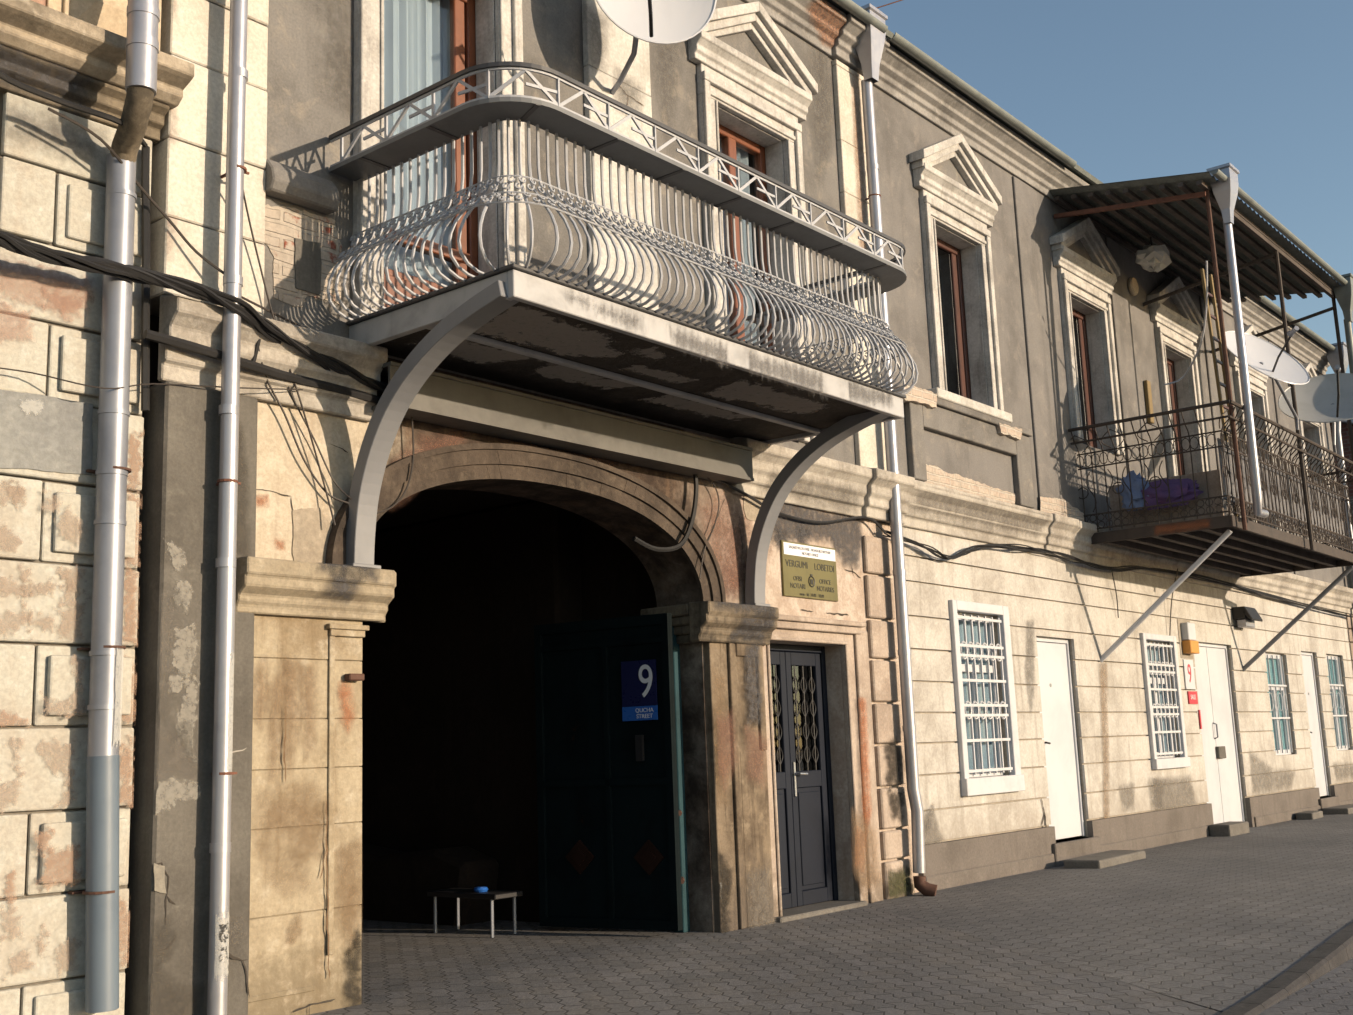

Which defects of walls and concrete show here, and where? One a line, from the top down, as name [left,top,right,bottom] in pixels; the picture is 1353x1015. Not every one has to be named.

flaking render [265,204,342,307]
peeling [113,433,145,808]
flaking render [167,542,200,762]
damp [322,563,376,600]
flaking render [156,777,201,814]
rust [856,700,870,866]
peeling [119,896,130,966]
damp [345,930,363,1006]